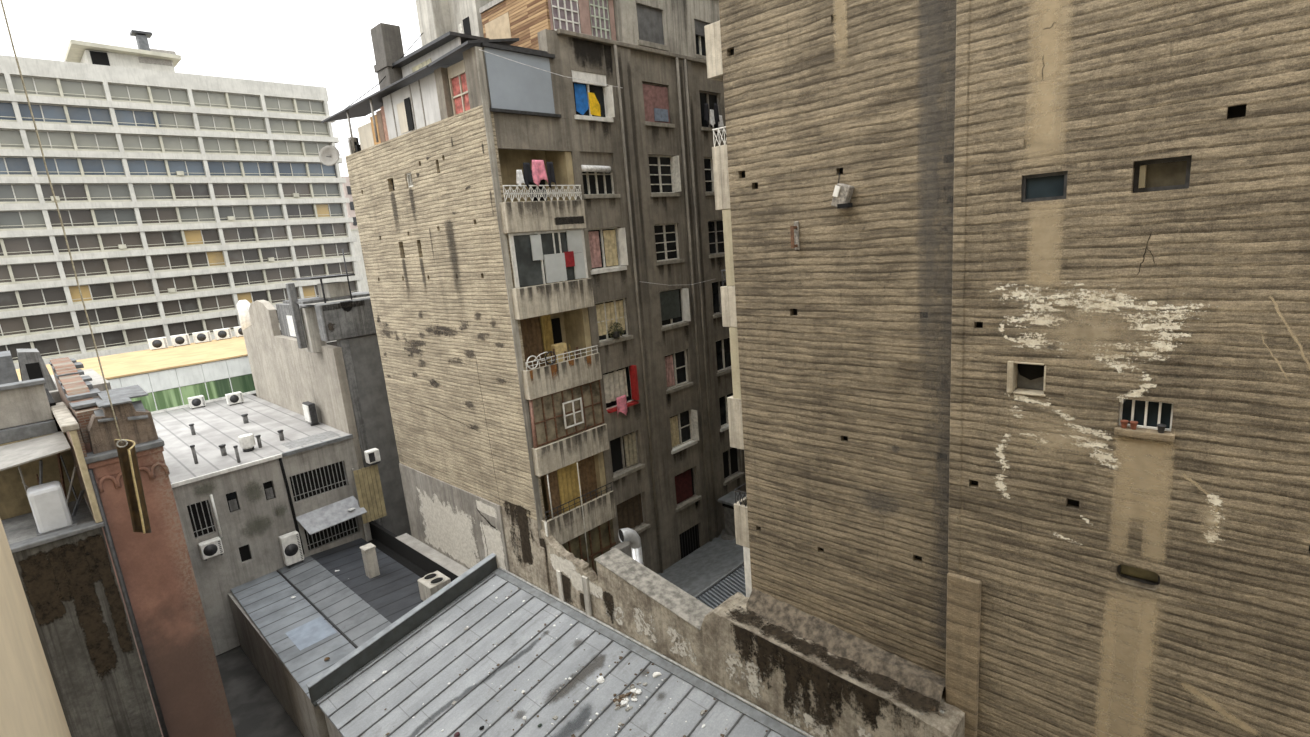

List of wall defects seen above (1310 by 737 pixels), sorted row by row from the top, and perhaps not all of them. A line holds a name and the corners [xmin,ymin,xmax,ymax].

water stain [391,188,415,219]
water stain [402,228,433,286]
water stain [447,222,458,281]
efflorescence [989,281,1210,403]
crack [1262,296,1310,380]
efflorescence [994,393,1123,499]
water stain [503,470,640,565]
efflorescence [1183,474,1225,542]
water stain [730,623,919,732]